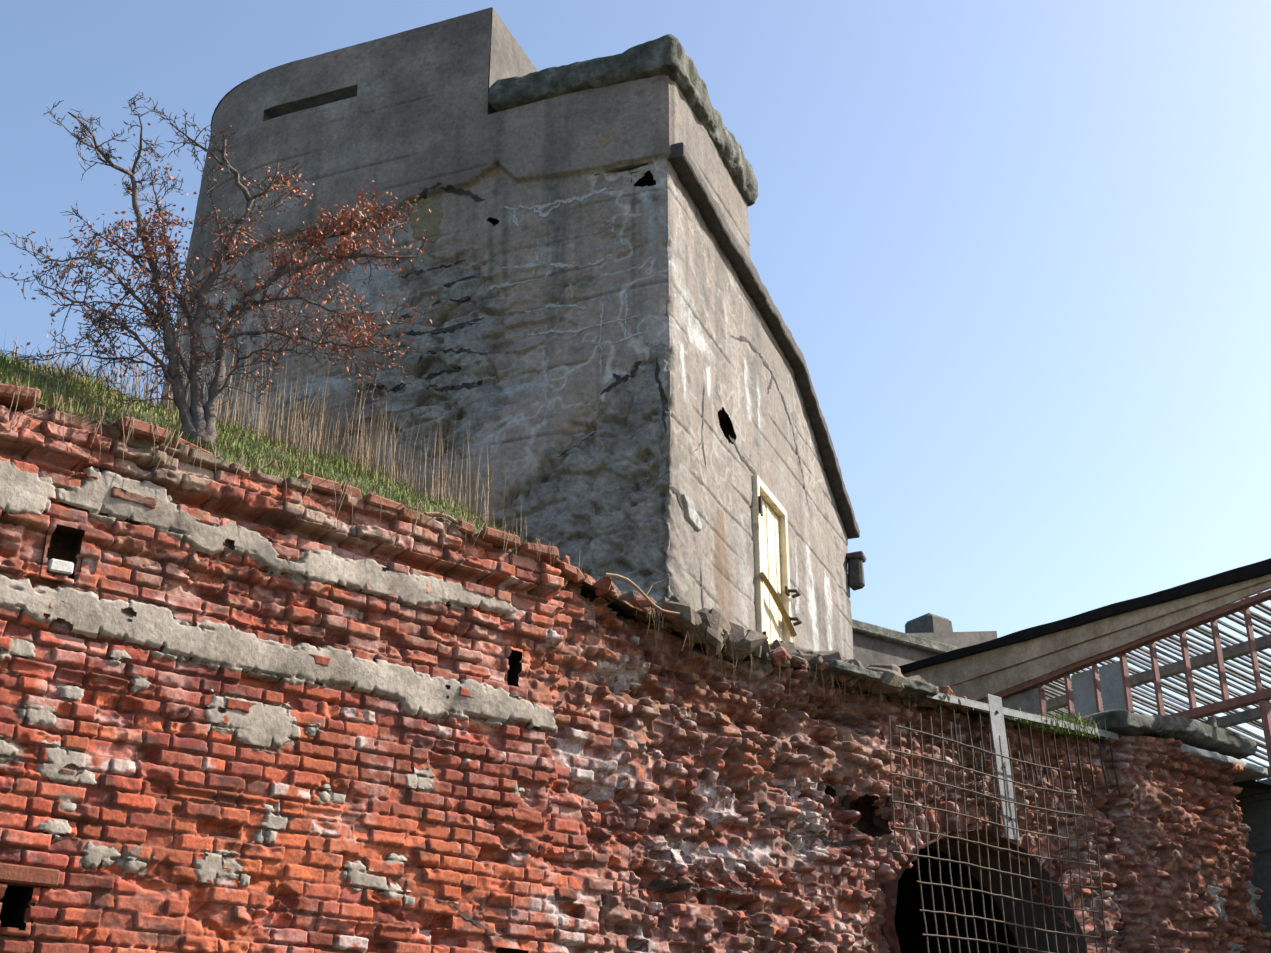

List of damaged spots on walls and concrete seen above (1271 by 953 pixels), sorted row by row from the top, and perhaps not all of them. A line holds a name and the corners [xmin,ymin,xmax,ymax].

leakage [639,190,675,271]
leakage [336,262,398,306]
crack [333,183,667,434]
crack [728,332,812,518]
spalling [39,524,85,583]
spalling [822,779,891,844]